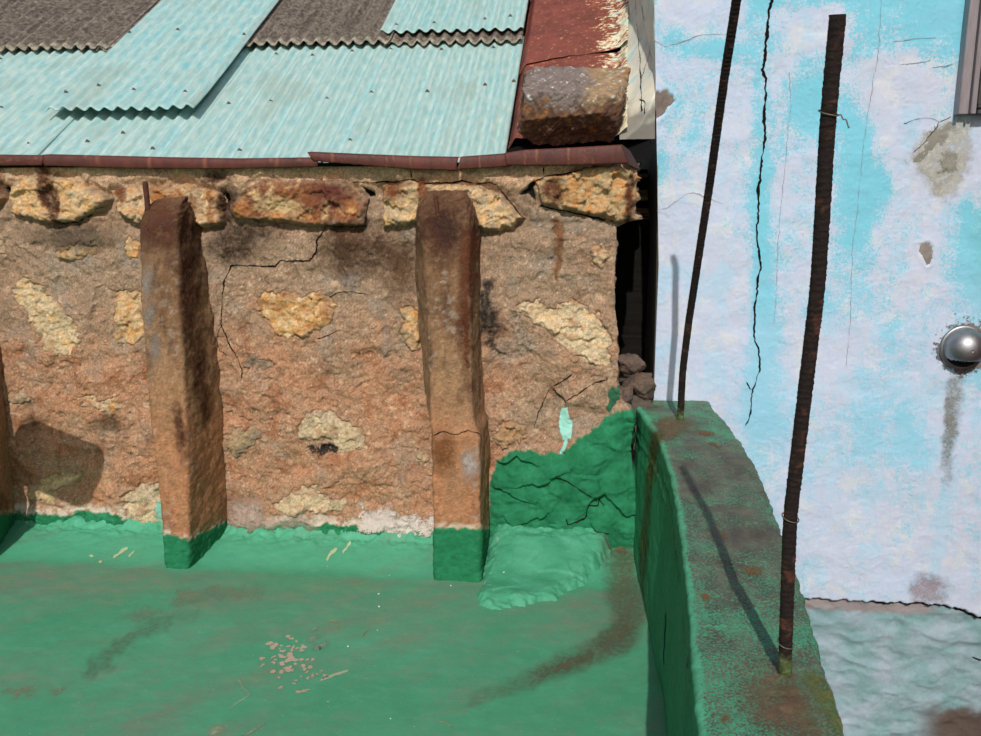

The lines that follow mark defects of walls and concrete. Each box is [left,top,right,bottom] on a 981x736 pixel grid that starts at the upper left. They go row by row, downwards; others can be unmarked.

peeling [656,90,675,118]
crack [535,167,586,182]
flaking render [914,120,972,195]
crack [745,0,791,426]
crack [216,170,618,378]
peeling [919,243,933,265]
spalling [777,14,850,678]
crack [534,374,620,426]
leakage [943,379,960,458]
crack [555,477,604,525]
corrosion [535,419,687,681]